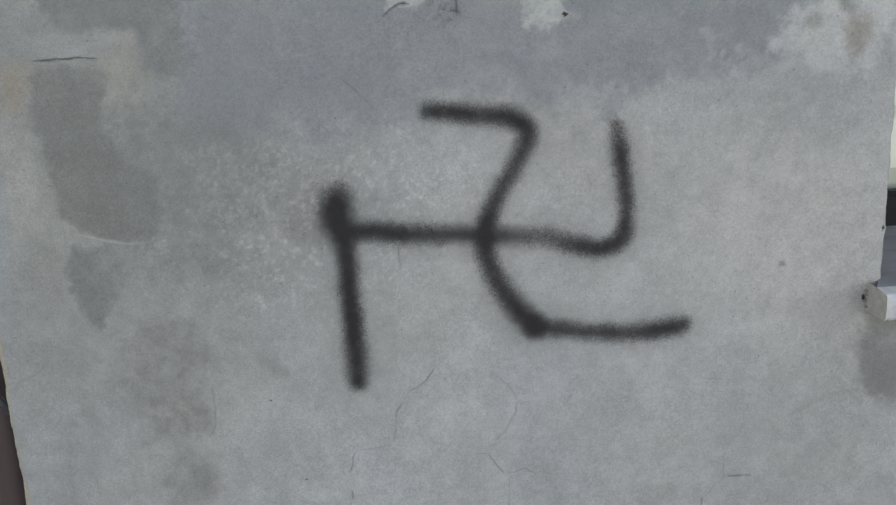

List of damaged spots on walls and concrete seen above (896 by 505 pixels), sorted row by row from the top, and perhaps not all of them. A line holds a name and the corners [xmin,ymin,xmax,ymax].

damp [27,0,797,336]
damp [97,297,232,505]
crack [350,364,435,505]
crack [475,376,559,505]
damp [787,310,896,418]